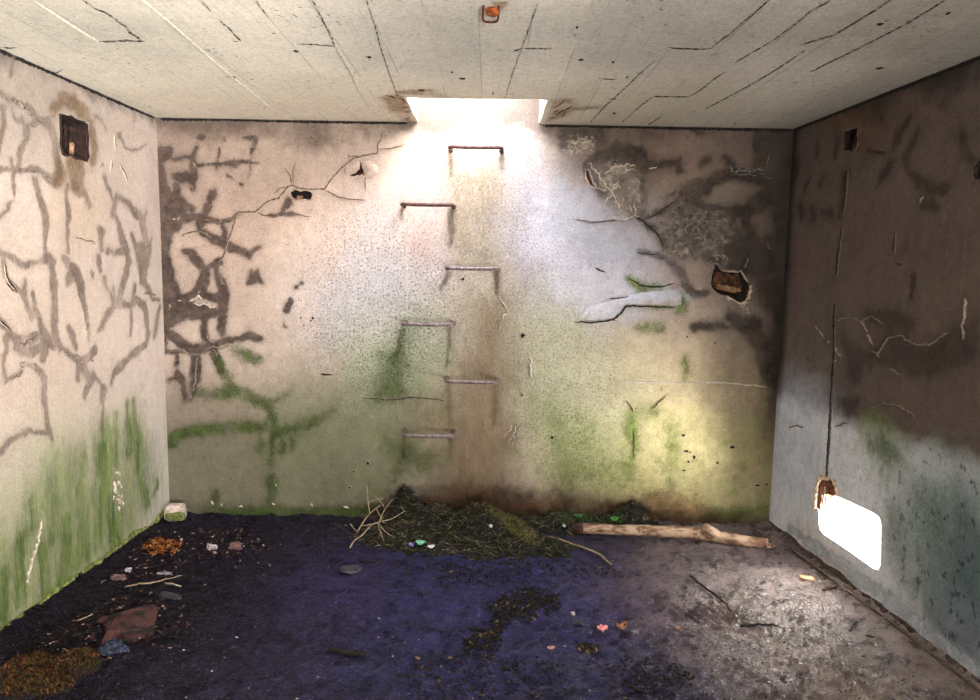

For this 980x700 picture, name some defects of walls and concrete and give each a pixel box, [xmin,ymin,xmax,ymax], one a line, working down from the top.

crack [84,1,144,59]
crack [545,0,980,132]
rust [52,94,98,194]
crack [0,47,407,263]
water stain [0,90,264,455]
crack [574,278,675,324]
water stain [559,127,790,384]
spalling [711,264,753,305]
crack [826,302,837,477]
water stain [960,298,969,354]
water stain [0,398,158,625]
spalling [813,473,839,511]